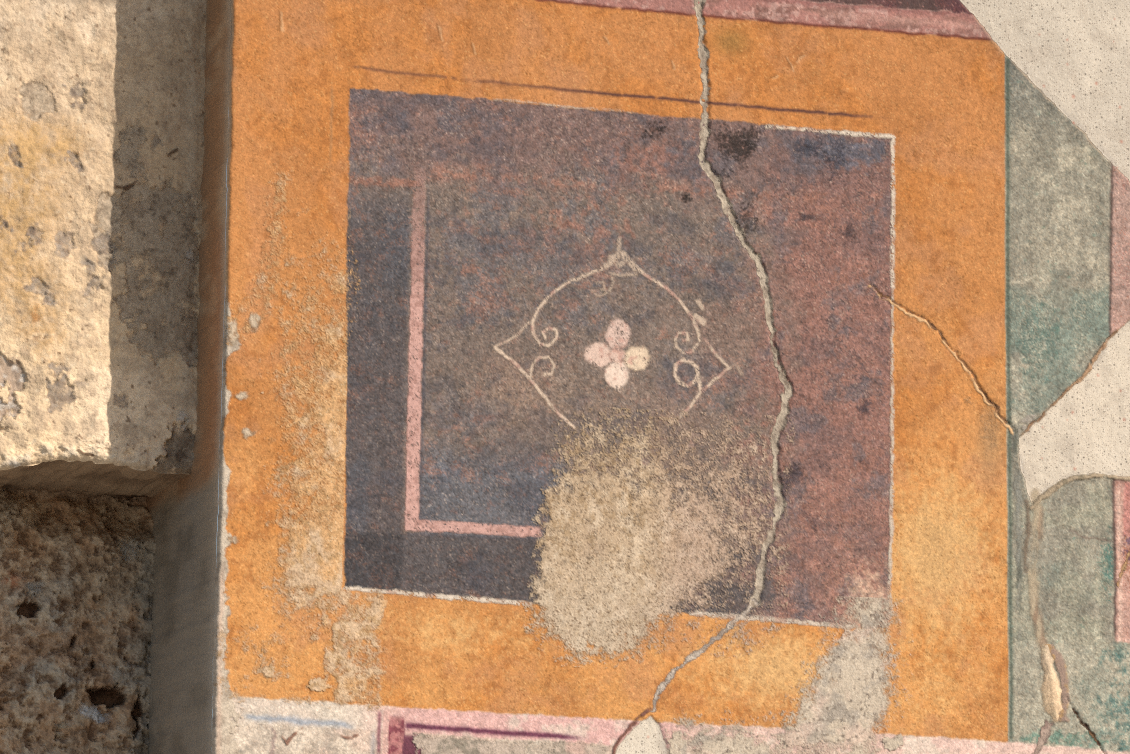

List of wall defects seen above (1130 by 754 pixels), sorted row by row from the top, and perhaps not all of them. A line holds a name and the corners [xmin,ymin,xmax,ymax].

flaking render [960,0,1130,181]
crack [650,0,793,712]
crack [869,284,1014,434]
flaking render [1019,321,1130,509]
peeling [524,407,793,667]
crack [1117,551,1130,587]
peeling [413,596,911,754]
crack [1032,709,1101,754]